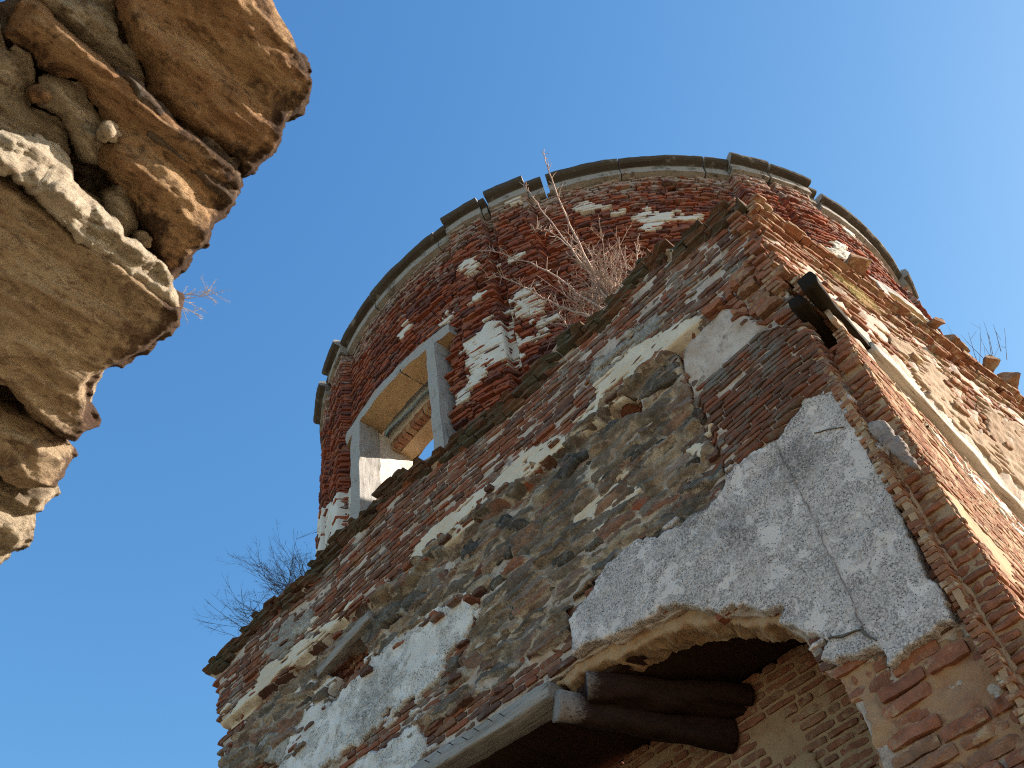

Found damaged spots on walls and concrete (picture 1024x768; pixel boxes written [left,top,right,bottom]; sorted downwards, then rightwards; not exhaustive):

flaking render [397,319,414,340]
flaking render [456,251,526,278]
flaking render [406,264,794,573]
flaking render [572,201,705,232]
flaking render [888,334,1024,489]
flaking render [569,391,1024,768]
crack [773,440,876,640]
flaking render [255,592,490,768]